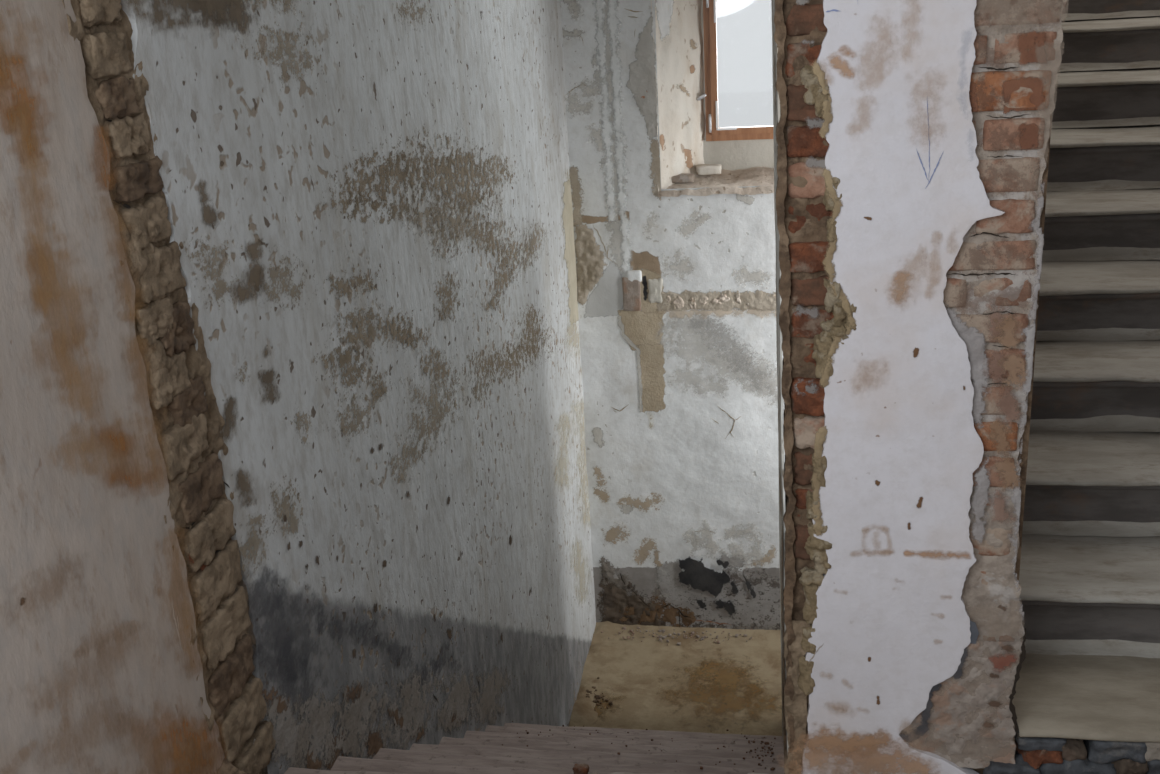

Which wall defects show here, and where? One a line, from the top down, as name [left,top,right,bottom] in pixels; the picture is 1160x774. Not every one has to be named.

flaking render [62,0,518,774]
peeling [313,127,556,497]
peeling [568,53,609,170]
flaking render [569,166,630,305]
flaking render [597,0,857,774]
flaking render [900,0,1067,769]